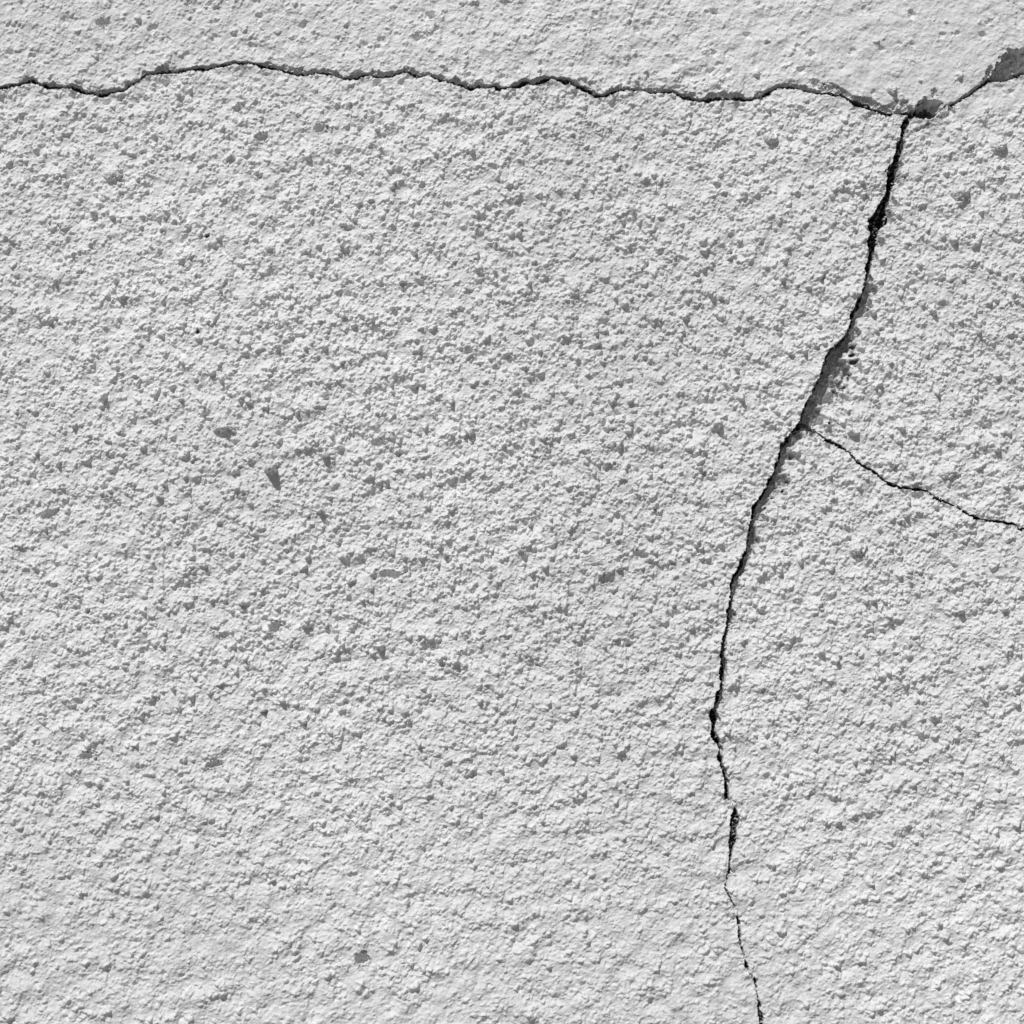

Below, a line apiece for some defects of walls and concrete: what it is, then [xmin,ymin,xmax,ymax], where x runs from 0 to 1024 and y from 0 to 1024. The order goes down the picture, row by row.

crack [0,58,915,119]
crack [943,64,1016,110]
crack [707,117,1024,1024]